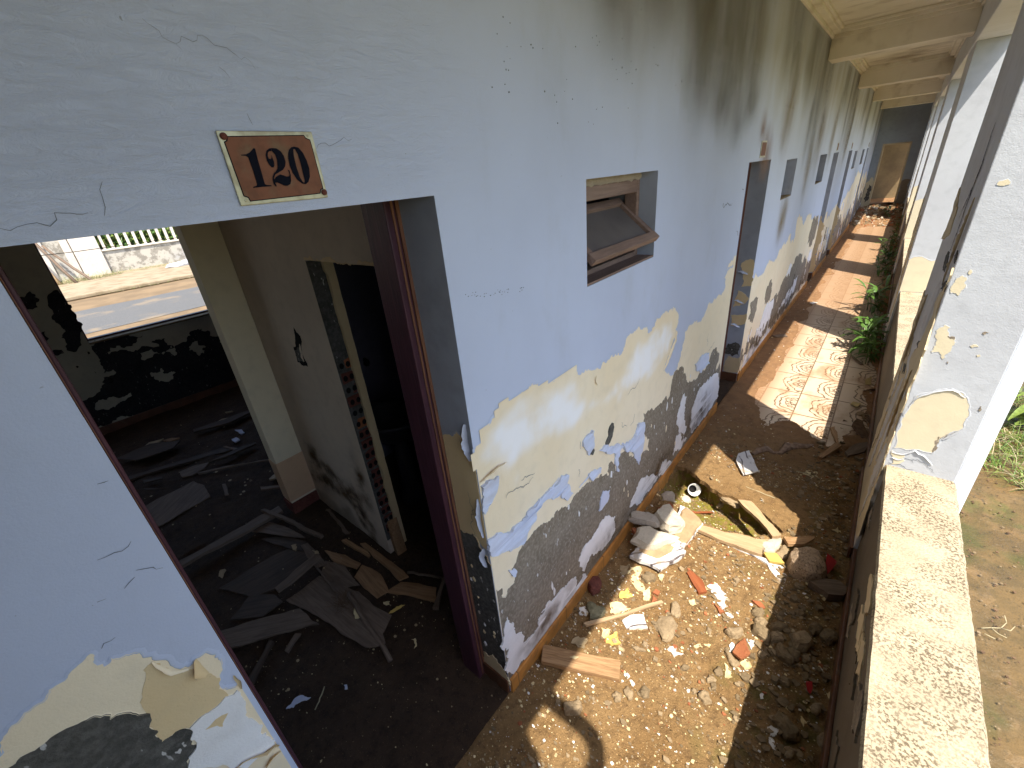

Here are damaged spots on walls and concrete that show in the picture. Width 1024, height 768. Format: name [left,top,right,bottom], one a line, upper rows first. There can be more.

crack [0,183,106,231]
peeling [95,393,132,410]
peeling [150,368,176,382]
peeling [442,169,873,687]
peeling [855,167,982,540]
peeling [0,647,291,768]
peeling [830,574,875,768]